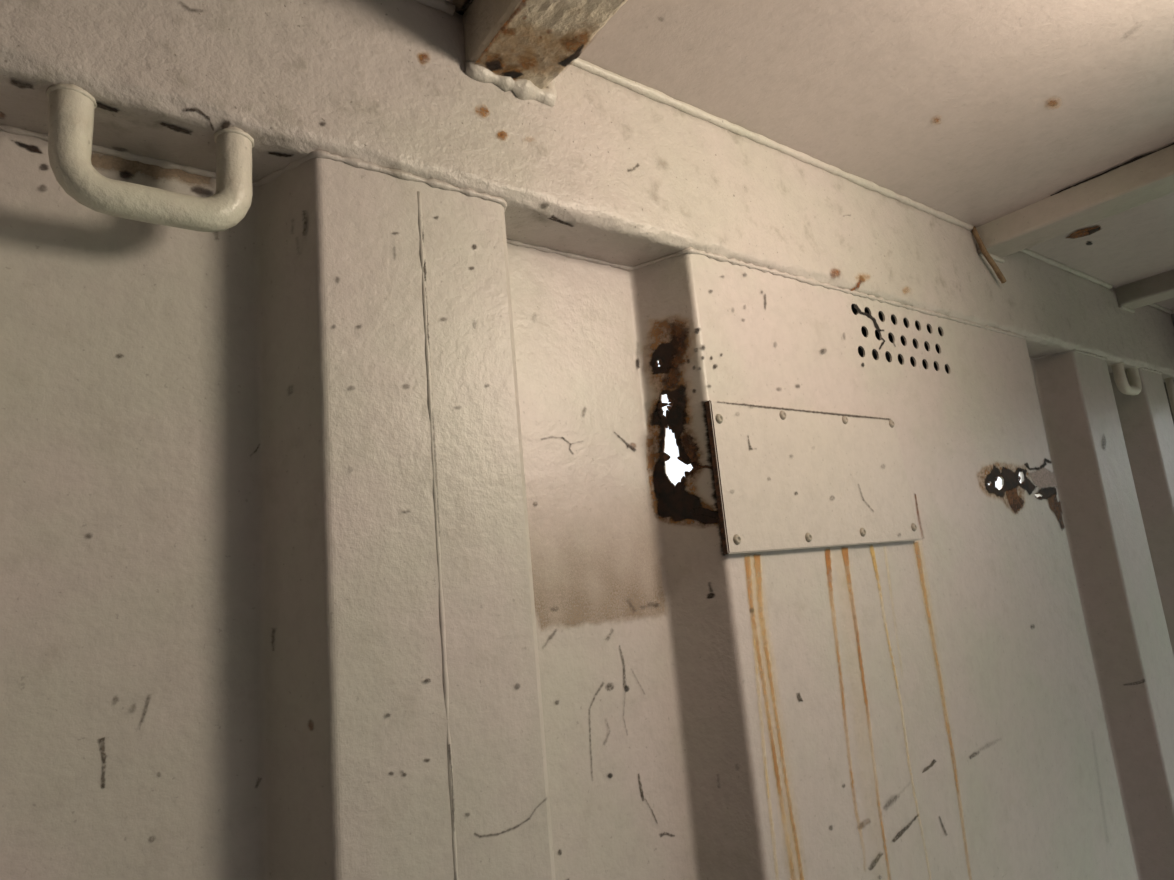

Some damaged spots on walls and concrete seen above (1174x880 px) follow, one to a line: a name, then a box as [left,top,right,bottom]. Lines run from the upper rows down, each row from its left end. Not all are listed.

corrosion [477,0,537,80]
corrosion [539,29,589,67]
peeling [649,324,719,524]
corrosion [702,401,726,556]
peeling [985,466,1065,530]
corrosion [825,548,853,600]
corrosion [914,543,931,623]
corrosion [854,616,868,713]
corrosion [745,555,804,880]